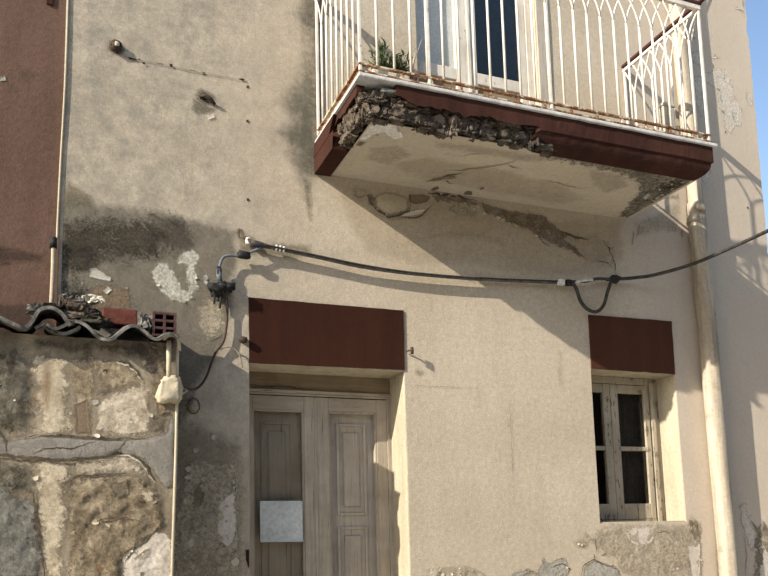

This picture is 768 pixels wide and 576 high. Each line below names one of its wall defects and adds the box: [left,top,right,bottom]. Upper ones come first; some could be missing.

leakage [289,0,317,183]
spalling [336,87,557,158]
crack [428,192,477,206]
leakage [551,156,690,218]
flaking render [151,250,208,303]
flaking render [13,346,169,438]
leakage [60,185,243,571]
crack [0,434,155,482]
flaking render [33,448,249,576]
peeling [577,517,702,576]
flaking render [741,503,768,576]